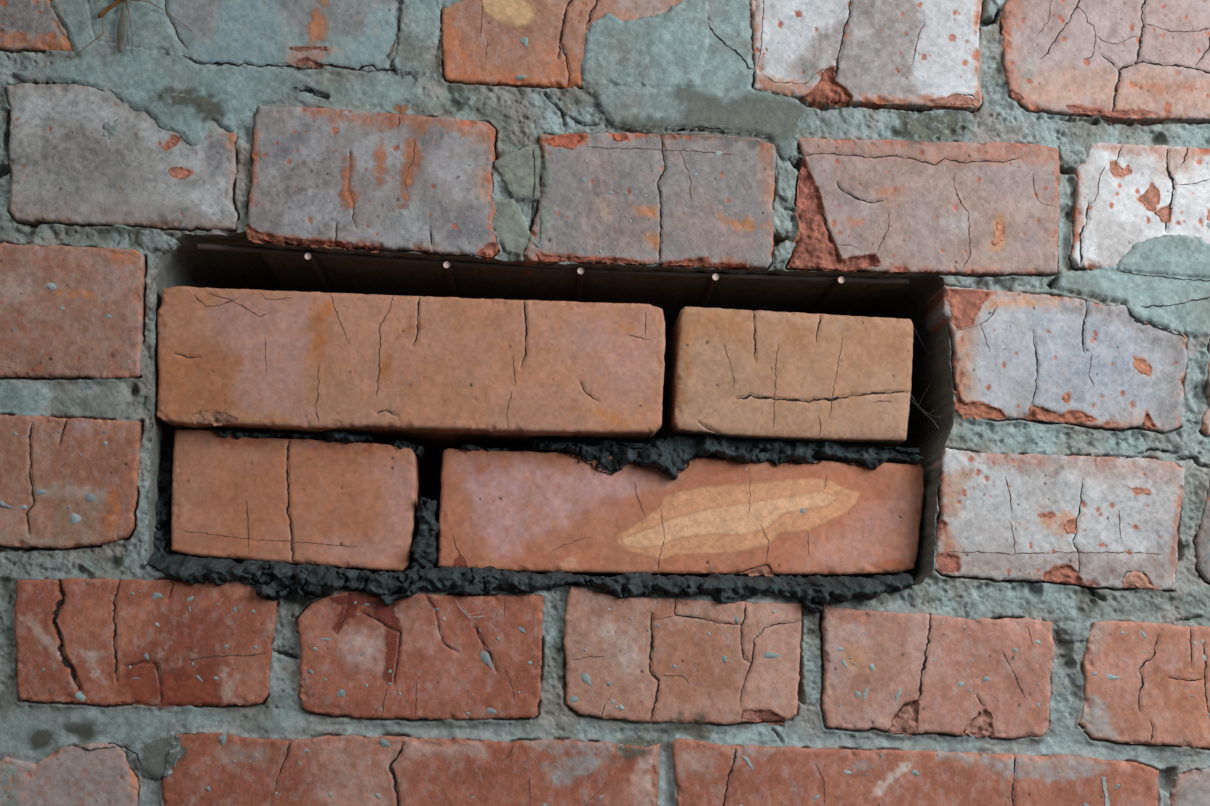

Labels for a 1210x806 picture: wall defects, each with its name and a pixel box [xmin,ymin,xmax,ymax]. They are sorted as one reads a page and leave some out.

spalling [799,66,853,111]
crack [1038,0,1210,113]
spalling [786,159,881,273]
crack [806,153,1048,268]
spalling [1111,159,1132,176]
spalling [1139,183,1171,222]
crack [1165,147,1209,232]
crack [1118,269,1210,338]
crack [724,311,905,437]
spalling [954,390,1006,421]
spalling [1027,394,1094,425]
crack [649,602,798,740]